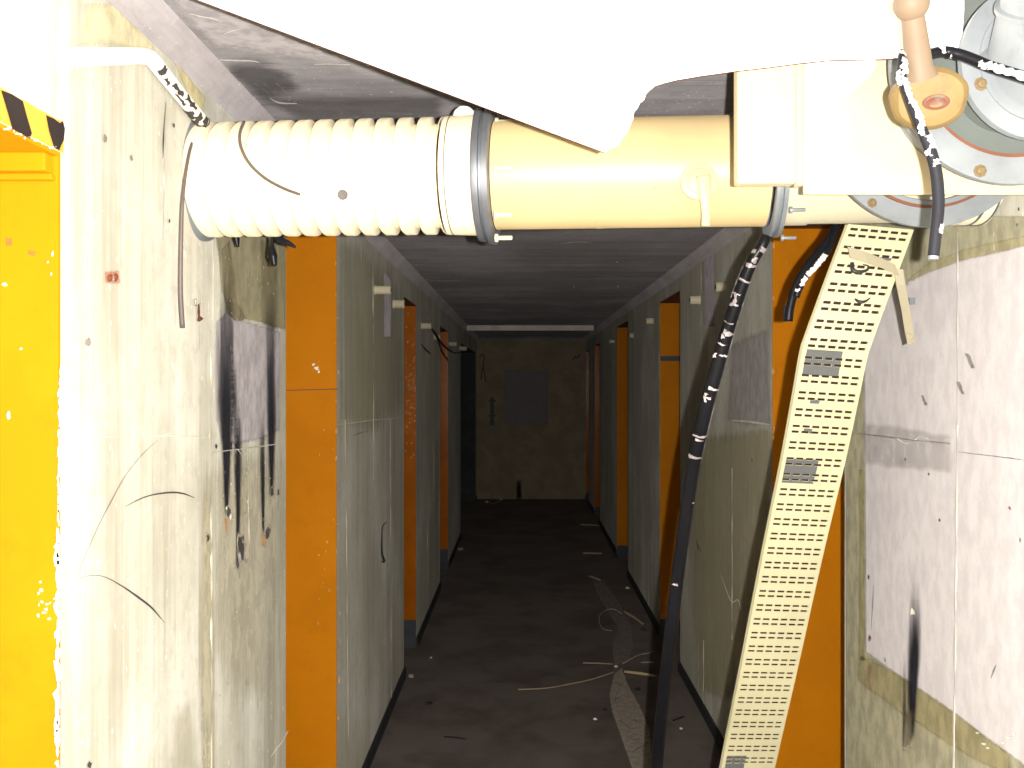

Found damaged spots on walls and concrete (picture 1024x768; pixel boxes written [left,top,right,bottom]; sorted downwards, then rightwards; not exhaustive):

water stain [216,235,286,443]
crack [63,433,285,576]
water stain [846,216,1024,768]